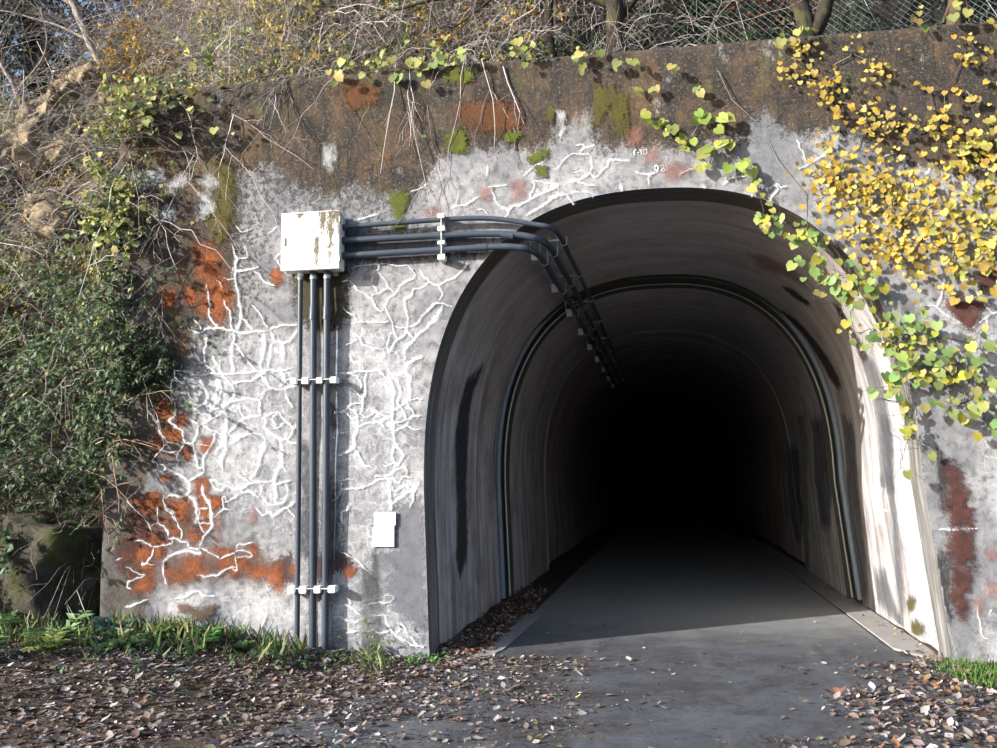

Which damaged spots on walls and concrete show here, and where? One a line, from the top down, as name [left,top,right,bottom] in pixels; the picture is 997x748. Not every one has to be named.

corrosion [341,81,383,110]
corrosion [451,95,524,137]
crack [432,127,828,227]
corrosion [160,242,236,329]
corrosion [150,399,214,482]
crack [117,226,297,607]
crack [334,264,466,522]
corrosion [112,477,295,596]
damp [787,416,831,570]
crack [333,594,424,648]